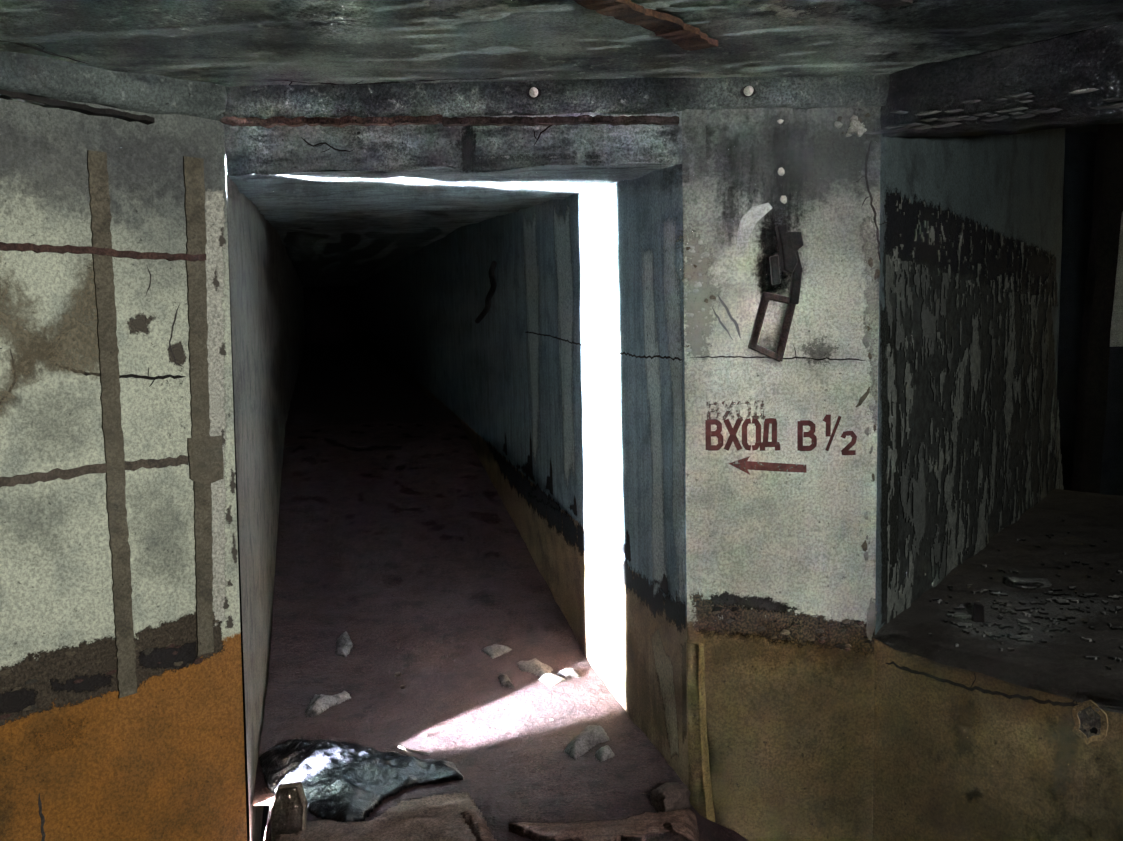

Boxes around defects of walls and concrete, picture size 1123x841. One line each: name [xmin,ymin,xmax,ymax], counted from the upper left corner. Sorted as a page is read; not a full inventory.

flaking render [127,312,156,335]
crack [525,332,866,361]
peeling [133,188,238,689]
peeling [483,188,1123,670]
flaking render [0,635,118,726]
crack [886,661,1123,710]